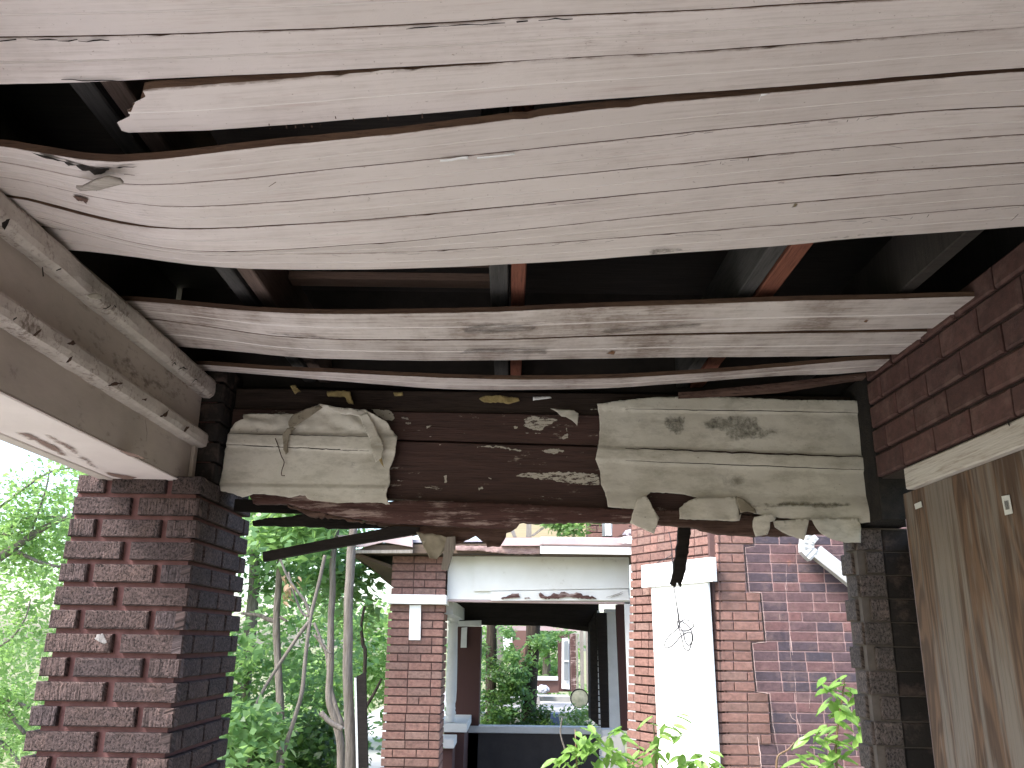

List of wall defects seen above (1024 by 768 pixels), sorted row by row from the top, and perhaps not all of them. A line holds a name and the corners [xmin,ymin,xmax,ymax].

peeling [514,408,593,454]
peeling [518,471,600,485]